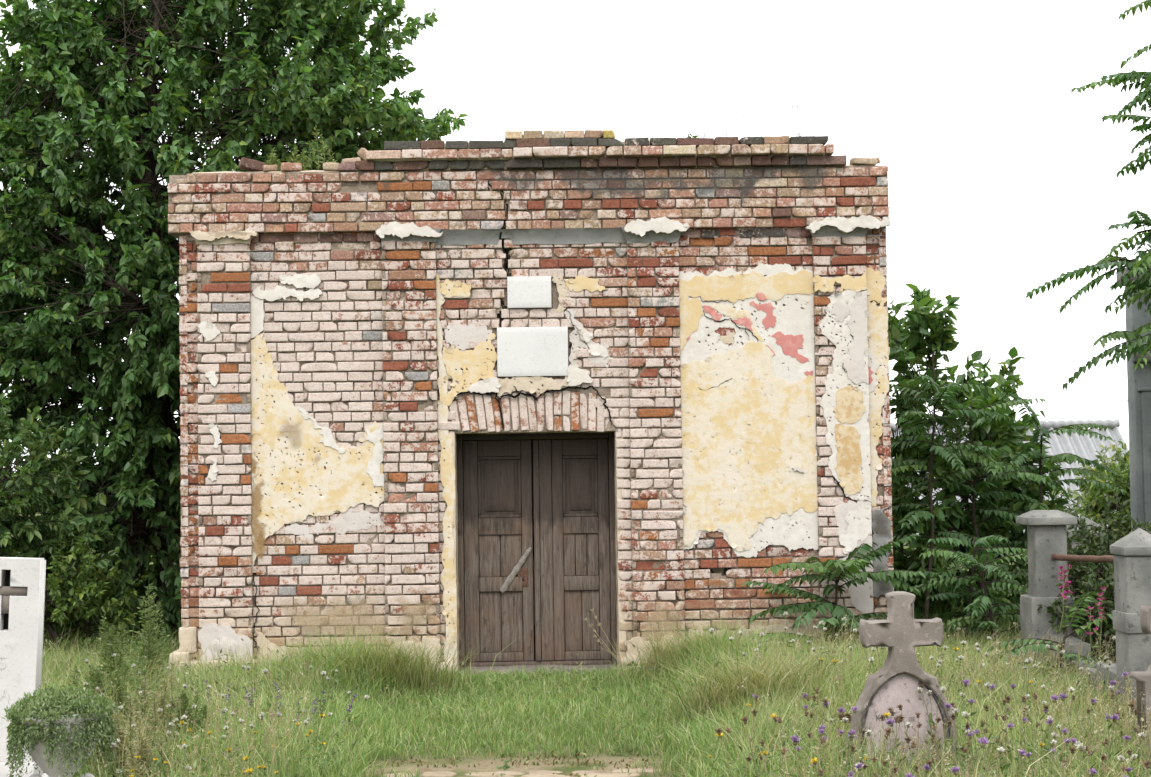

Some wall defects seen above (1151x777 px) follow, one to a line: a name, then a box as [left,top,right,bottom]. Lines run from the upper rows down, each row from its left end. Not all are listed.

crack [488,181,512,327]
peeling [565,276,607,292]
peeling [198,321,221,341]
peeling [578,326,609,359]
peeling [205,370,218,387]
peeling [208,423,222,482]
peeling [251,273,384,573]
peeling [436,273,593,662]
peeling [679,263,889,576]